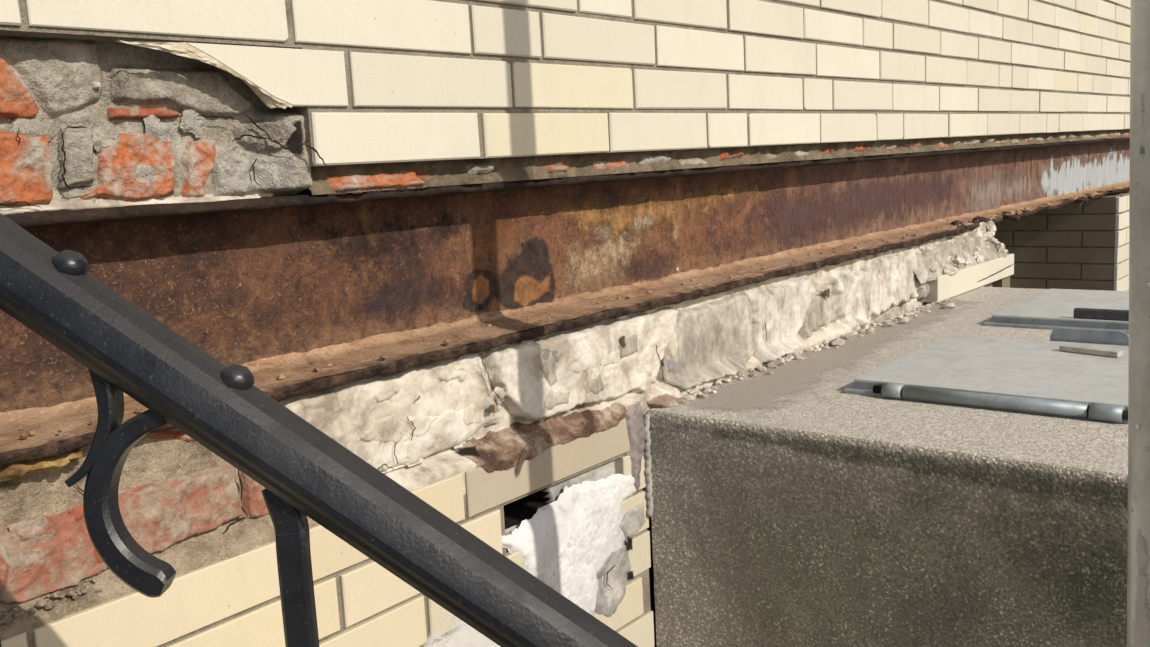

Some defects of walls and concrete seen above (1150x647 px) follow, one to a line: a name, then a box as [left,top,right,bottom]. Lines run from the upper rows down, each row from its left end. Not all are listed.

spalling [0,37,348,215]
corrosion [464,184,761,311]
corrosion [951,172,1059,230]
peeling [1015,147,1130,204]
flaking render [279,218,1008,617]
spalling [0,444,137,640]
spalling [118,429,276,577]